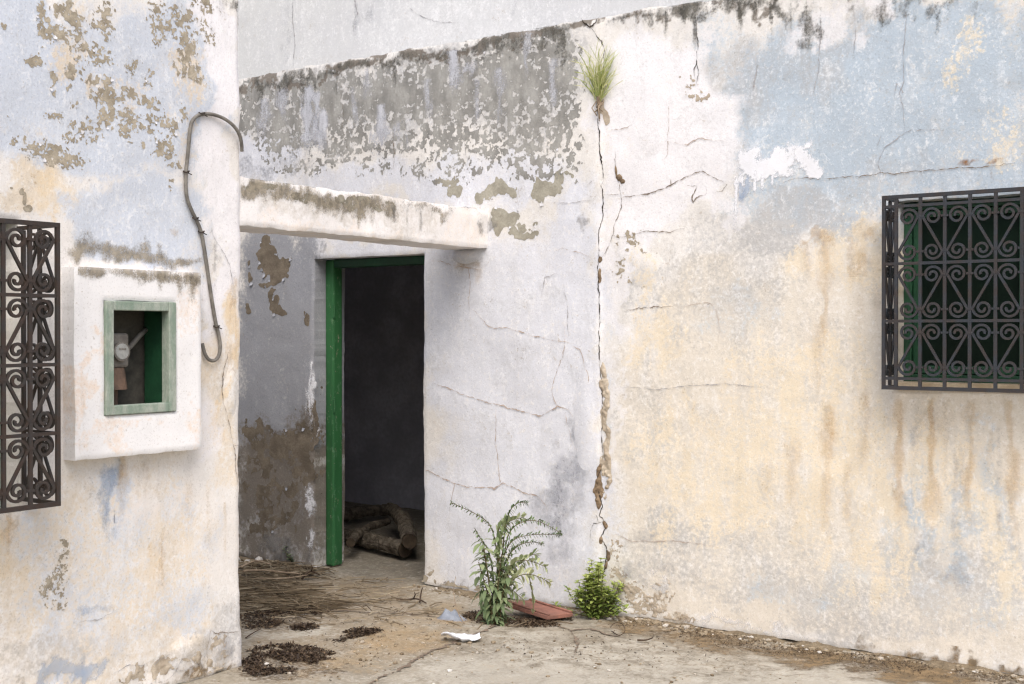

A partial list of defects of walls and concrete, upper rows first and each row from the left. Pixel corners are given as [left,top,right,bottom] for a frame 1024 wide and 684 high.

peeling [146,0,221,84]
crack [582,19,605,72]
damp [643,1,705,39]
damp [722,0,822,48]
peeling [9,0,190,191]
peeling [239,23,587,241]
peeling [247,235,292,317]
crack [426,108,755,610]
peeling [238,386,326,544]
peeling [39,539,70,611]